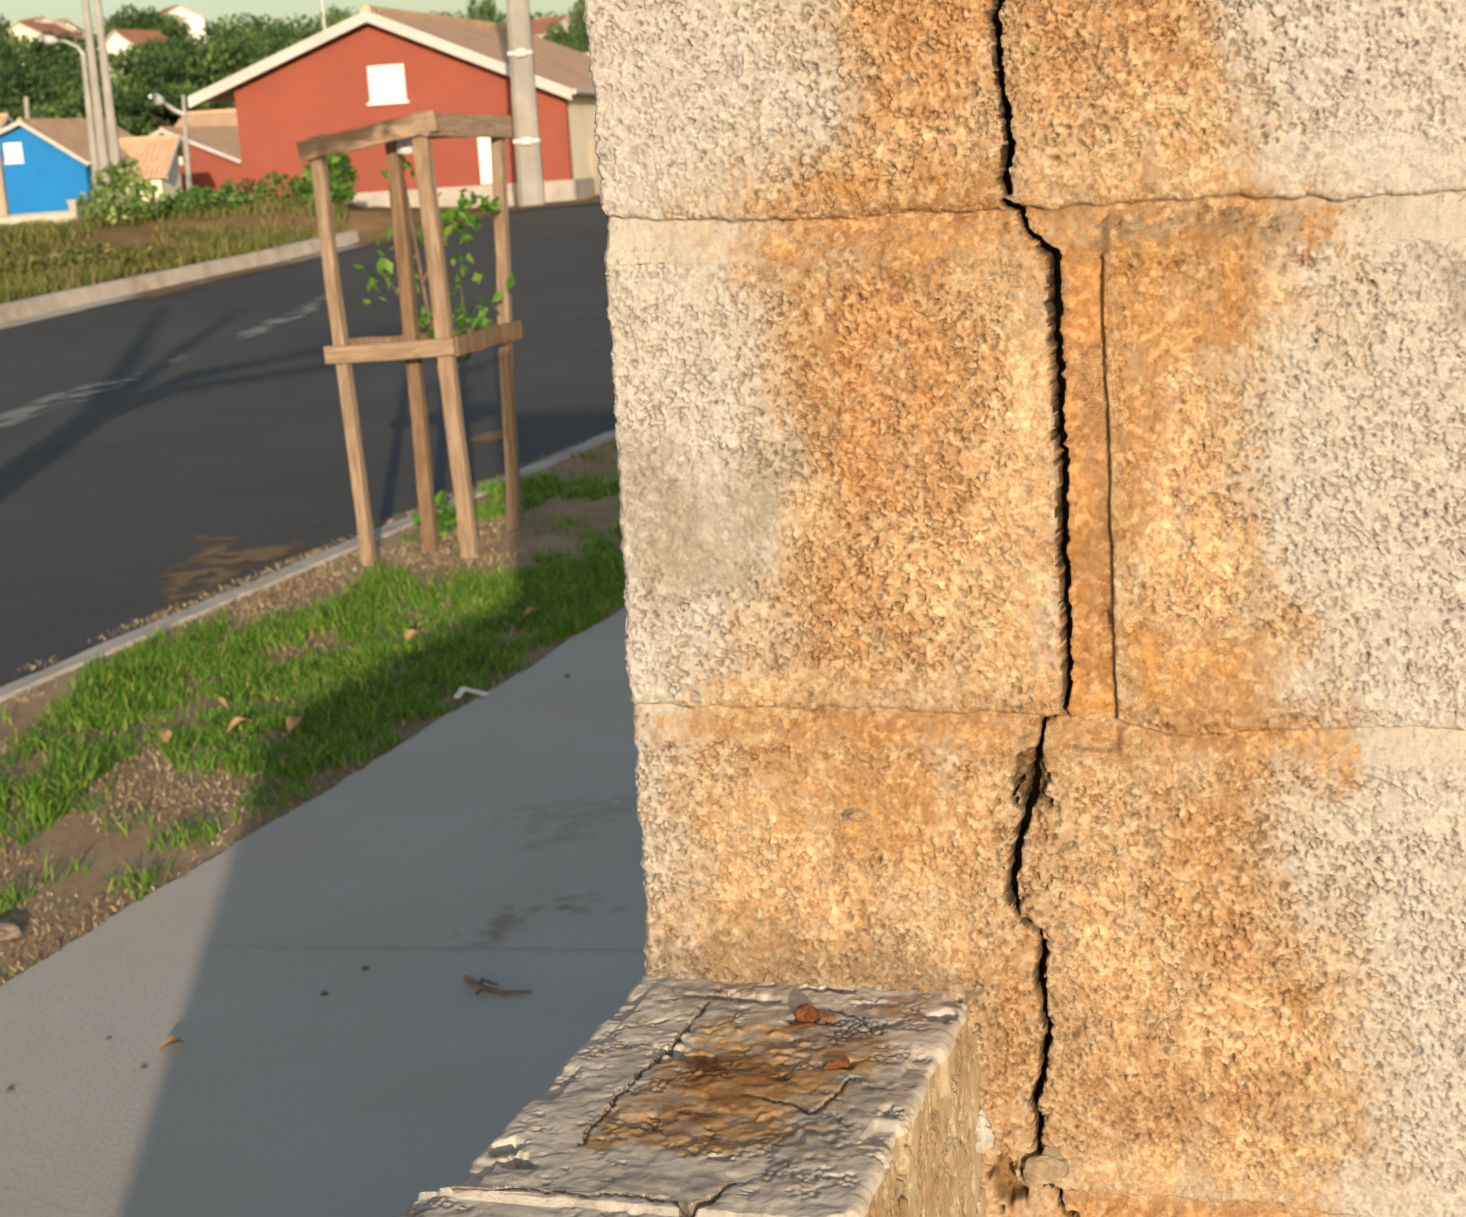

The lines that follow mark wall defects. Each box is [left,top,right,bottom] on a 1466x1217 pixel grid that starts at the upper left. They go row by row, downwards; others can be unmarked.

corrosion [586,1011,882,1157]
corrosion [648,0,1371,1217]
crack [986,0,1080,1217]